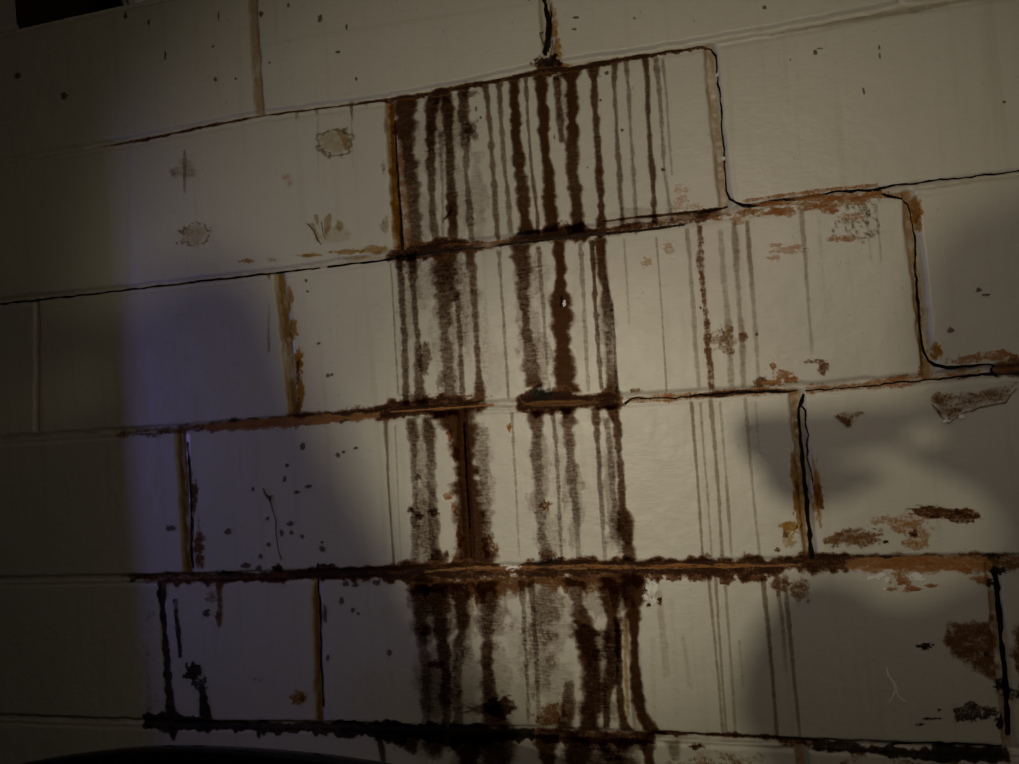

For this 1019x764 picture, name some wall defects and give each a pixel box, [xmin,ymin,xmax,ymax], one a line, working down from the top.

crack [539,0,553,57]
crack [624,46,1019,559]
rust [116,0,906,764]
rust [808,318,1019,394]
rust [921,550,1019,588]